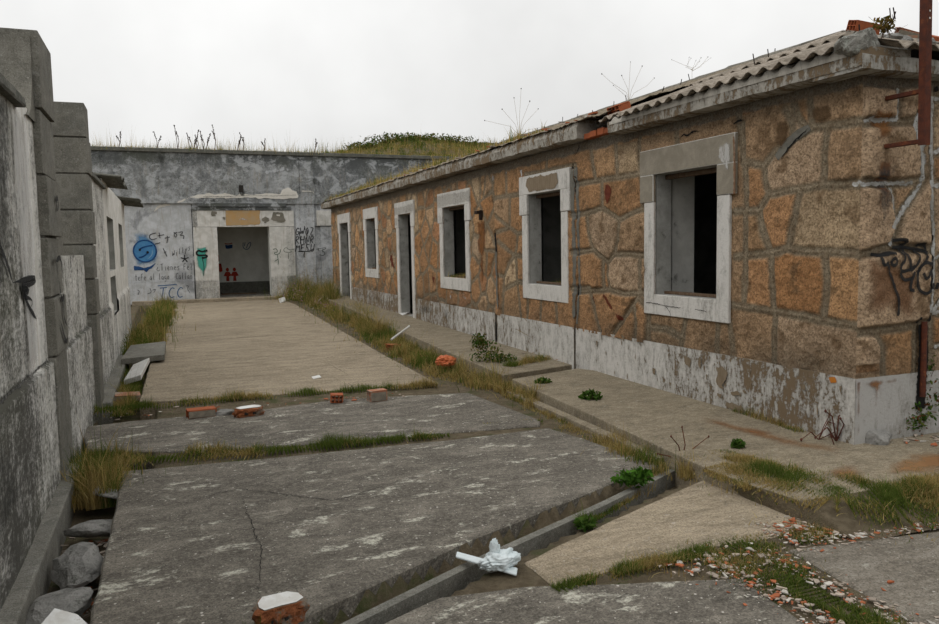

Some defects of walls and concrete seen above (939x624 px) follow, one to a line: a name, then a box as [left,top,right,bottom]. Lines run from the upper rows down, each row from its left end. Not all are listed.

rust [873,111,893,136]
peeling [683,355,767,413]